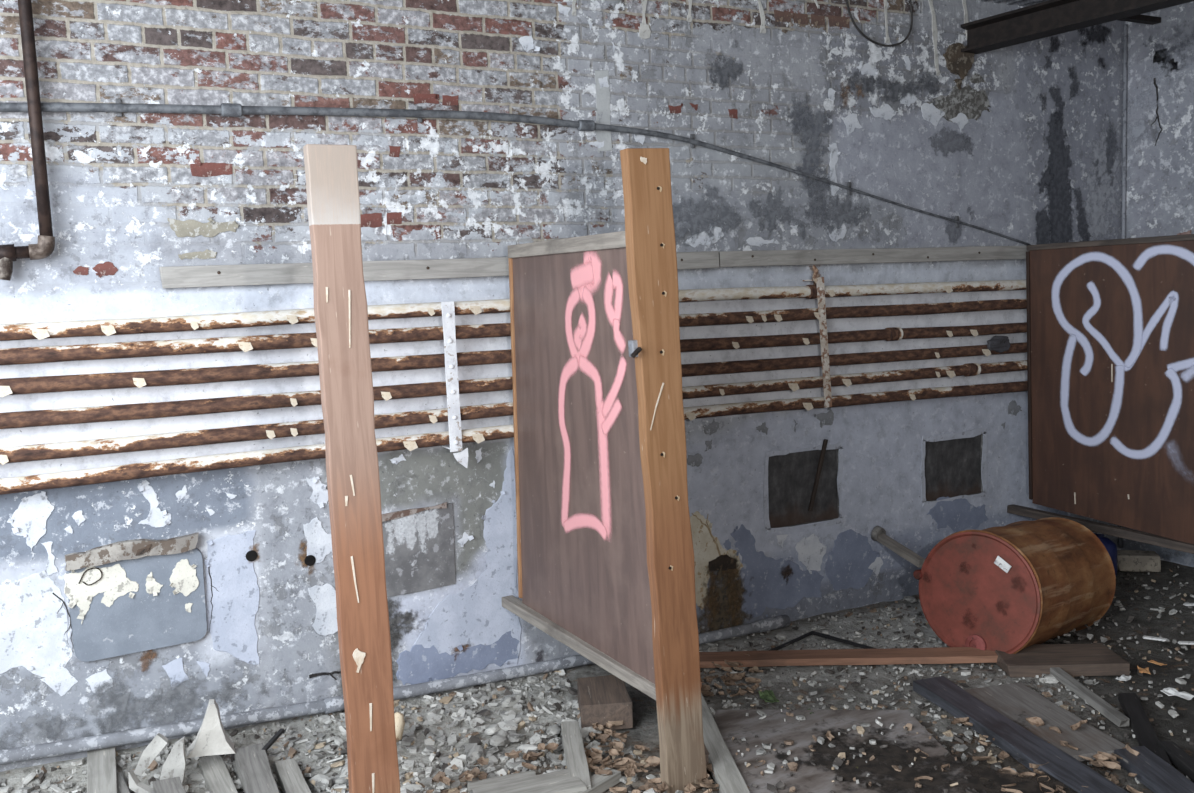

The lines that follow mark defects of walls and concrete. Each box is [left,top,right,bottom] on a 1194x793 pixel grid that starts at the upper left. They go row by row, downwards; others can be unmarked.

leakage [709,52,743,90]
leakage [843,69,948,108]
spalling [869,43,991,131]
spalling [190,161,233,177]
leakage [672,97,869,240]
leakage [1031,68,1131,244]
spalling [360,212,402,228]
spalling [73,262,118,278]
peeling [138,480,171,528]
leakage [385,509,439,565]
peeling [0,491,260,696]
leakage [387,600,424,649]